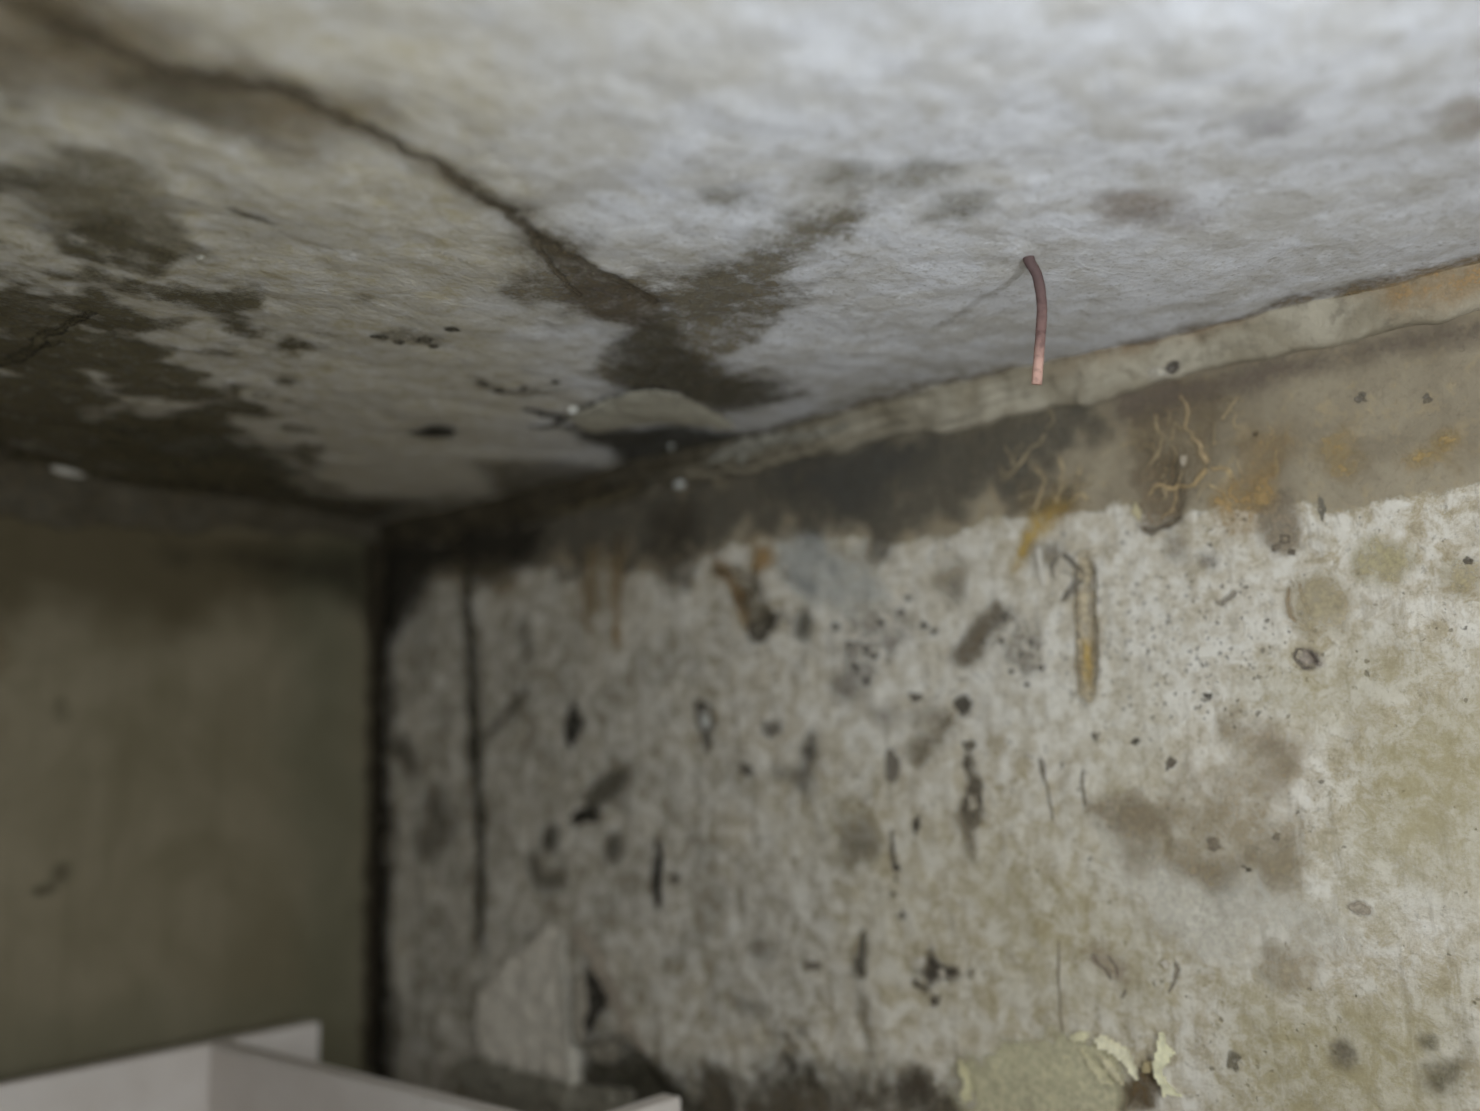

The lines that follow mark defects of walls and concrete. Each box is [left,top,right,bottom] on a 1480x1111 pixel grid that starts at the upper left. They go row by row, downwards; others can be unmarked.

water stain [0,0,367,134]
crack [47,17,659,302]
water stain [0,153,440,524]
water stain [501,209,863,411]
water stain [1180,279,1396,334]
water stain [380,405,1100,666]
peeling [953,1031,1182,1111]